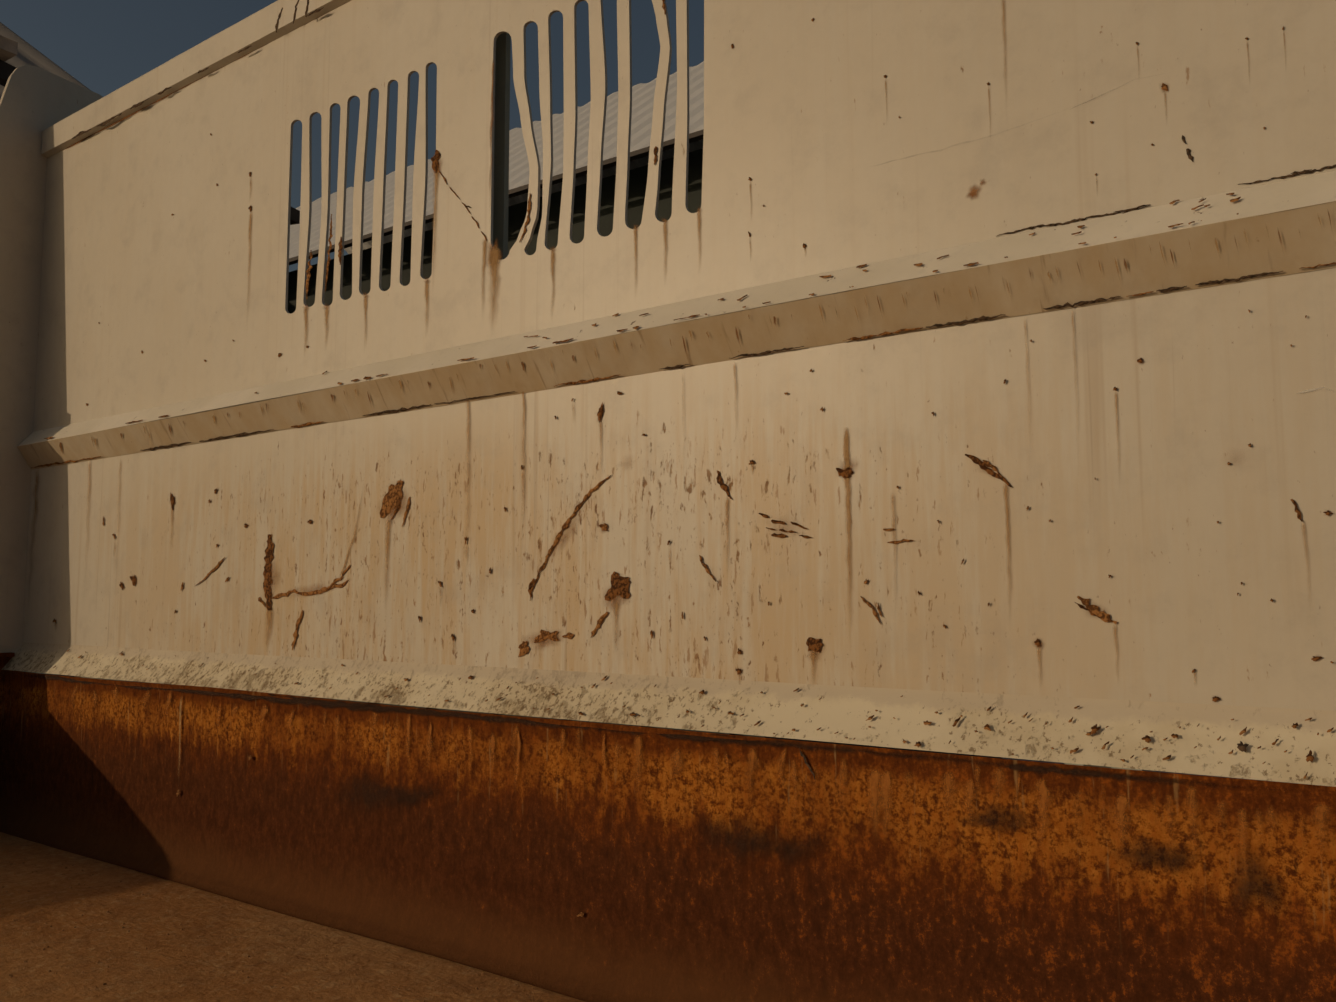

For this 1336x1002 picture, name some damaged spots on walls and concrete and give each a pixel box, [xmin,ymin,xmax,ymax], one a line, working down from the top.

rust [483,240,499,301]
rust [380,480,410,559]
rust [591,571,630,637]
rust [518,629,574,657]
rust [806,637,823,665]
rust [31,675,1195,835]